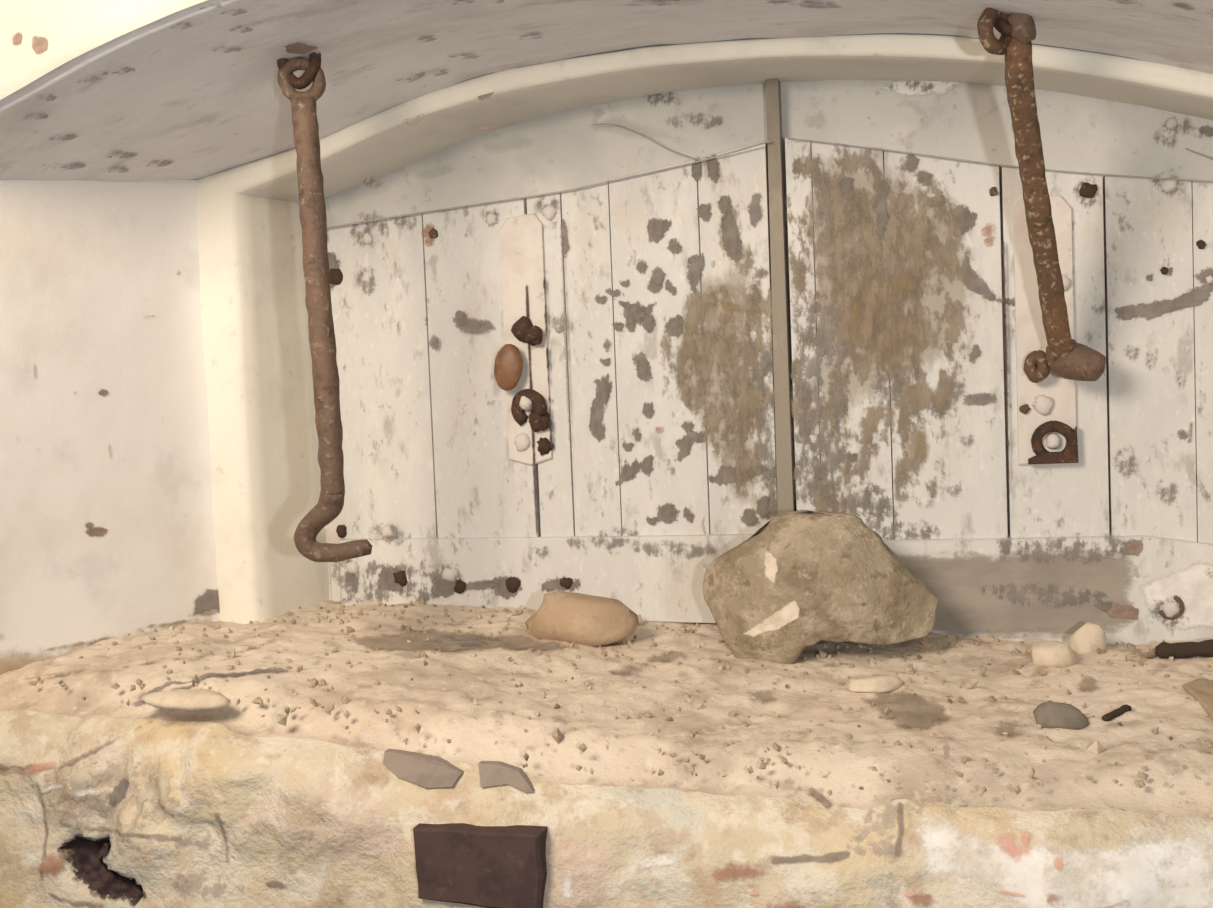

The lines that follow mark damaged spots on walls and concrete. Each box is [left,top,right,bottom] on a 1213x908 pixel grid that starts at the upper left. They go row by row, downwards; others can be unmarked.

rust [1196,267,1213,285]
peeling [589,154,778,526]
damp [788,147,970,516]
peeling [567,503,715,559]
peeling [331,559,522,602]
peeling [541,576,580,592]
spalling [35,741,227,907]
spalling [174,869,242,897]